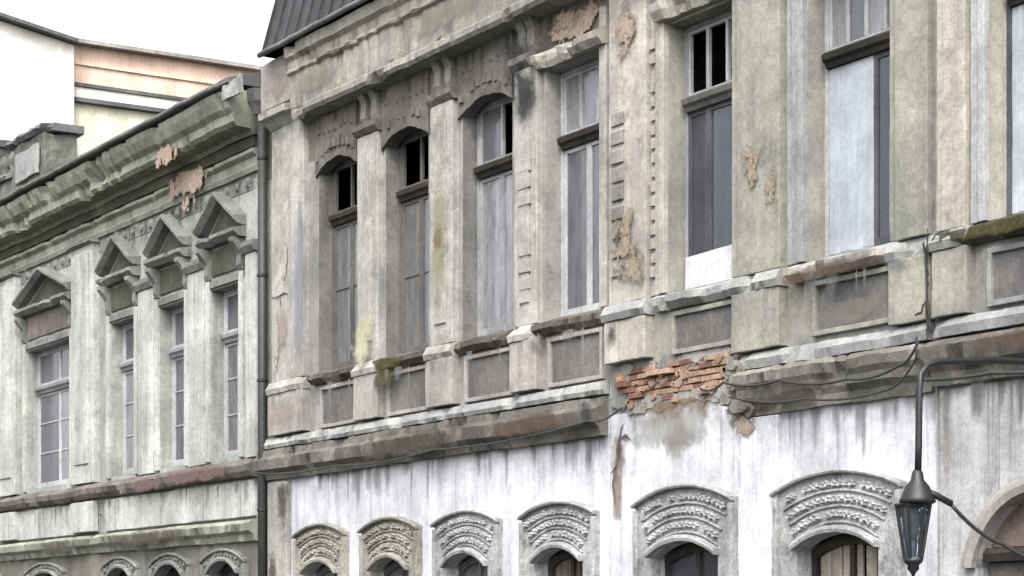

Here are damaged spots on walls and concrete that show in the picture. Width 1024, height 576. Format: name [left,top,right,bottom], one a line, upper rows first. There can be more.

flaking render [548,0,603,45]
flaking render [612,1,636,60]
flaking render [155,143,208,213]
flaking render [610,207,644,294]
flaking render [610,346,759,437]
damp [364,428,457,459]
crack [611,424,631,507]